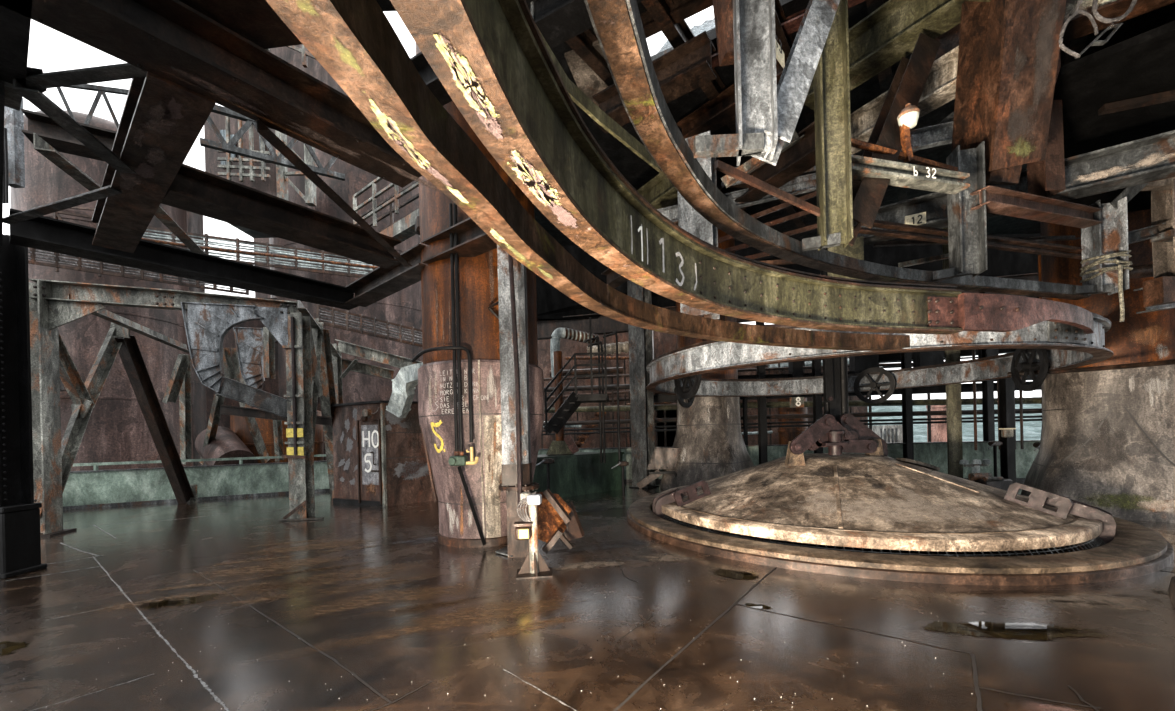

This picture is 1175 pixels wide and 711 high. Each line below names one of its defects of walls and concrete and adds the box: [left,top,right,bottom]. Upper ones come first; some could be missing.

rust [488,420,502,497]